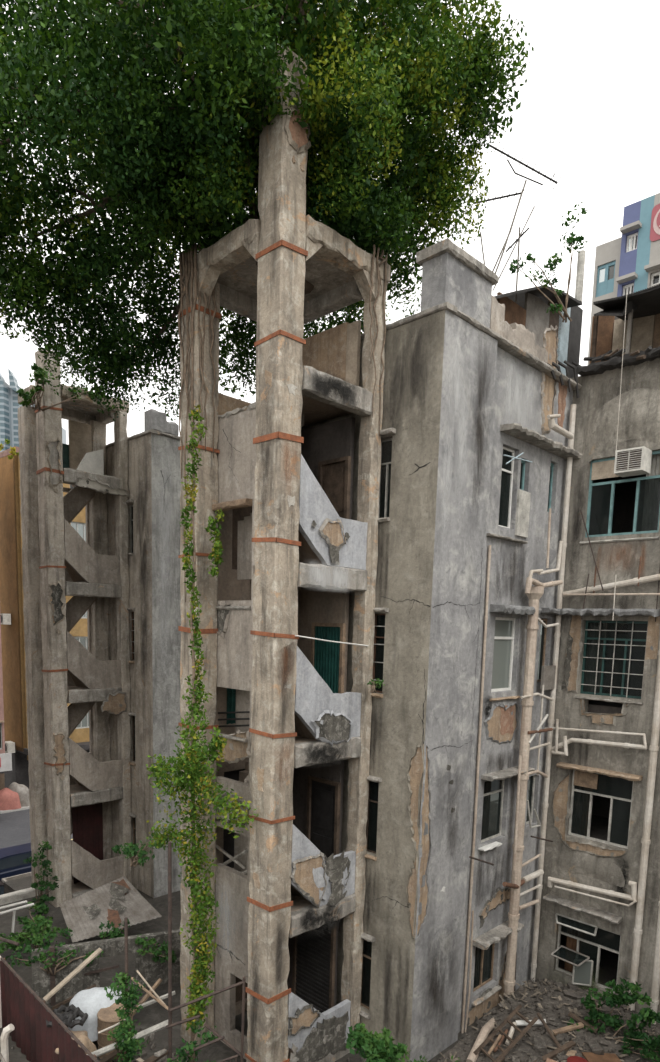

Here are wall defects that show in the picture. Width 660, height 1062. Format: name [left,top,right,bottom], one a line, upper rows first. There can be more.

peeling [312,518,350,565]
crack [385,548,483,814]
peeling [483,701,518,745]
peeling [406,741,446,940]
peeling [290,852,330,909]
peeling [288,1004,349,1062]